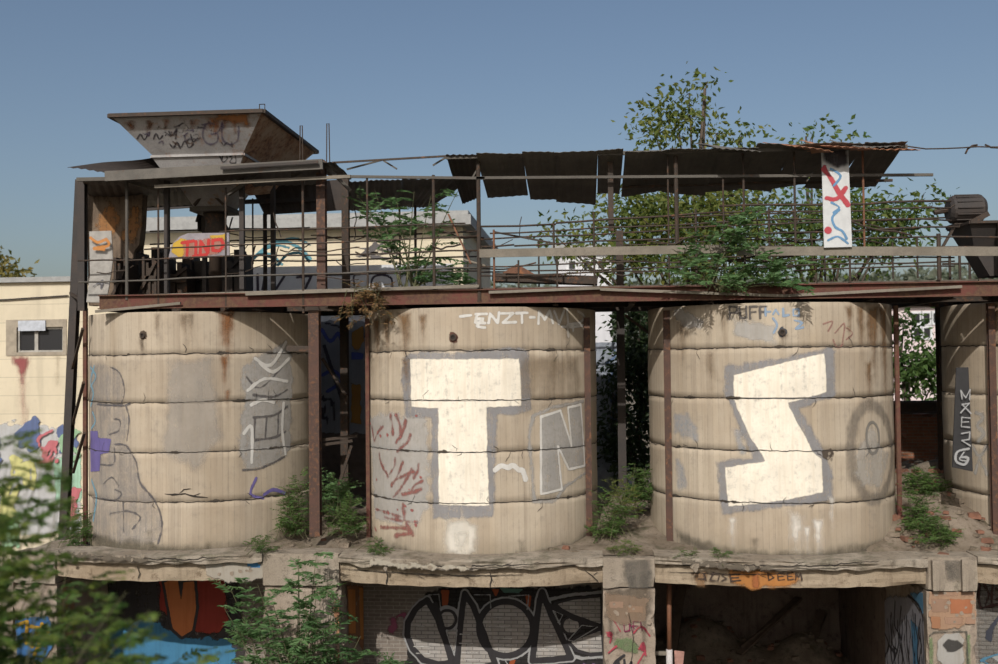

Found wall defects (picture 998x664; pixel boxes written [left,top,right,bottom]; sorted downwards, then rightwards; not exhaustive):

corrosion [222,312,233,342]
water stain [848,307,886,369]
spalling [370,558,472,571]